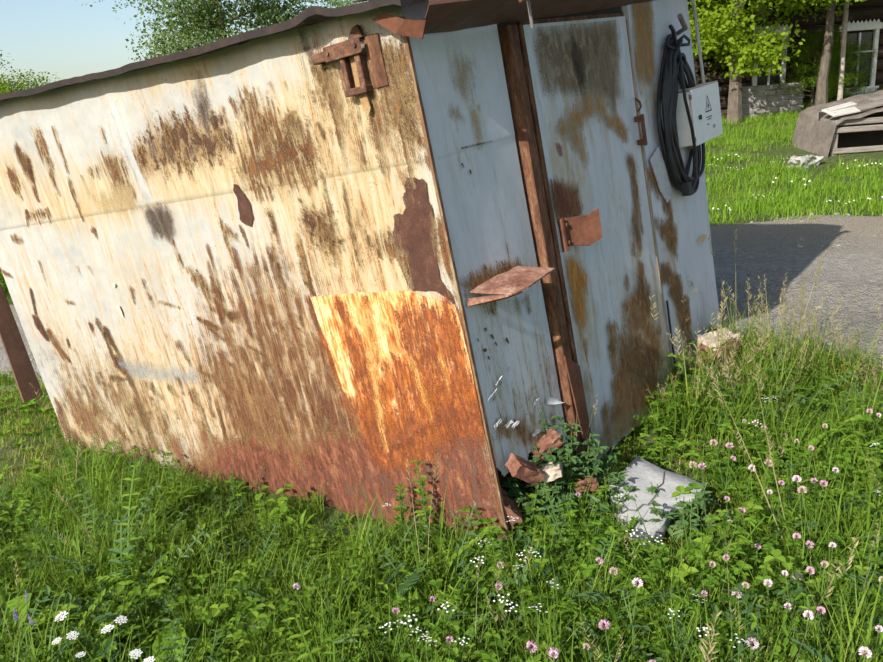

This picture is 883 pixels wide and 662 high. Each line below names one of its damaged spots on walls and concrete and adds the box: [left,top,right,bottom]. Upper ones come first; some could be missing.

corrosion [535,20,629,168]
corrosion [550,177,583,224]
corrosion [6,20,556,551]
corrosion [565,255,588,328]
corrosion [602,154,692,449]